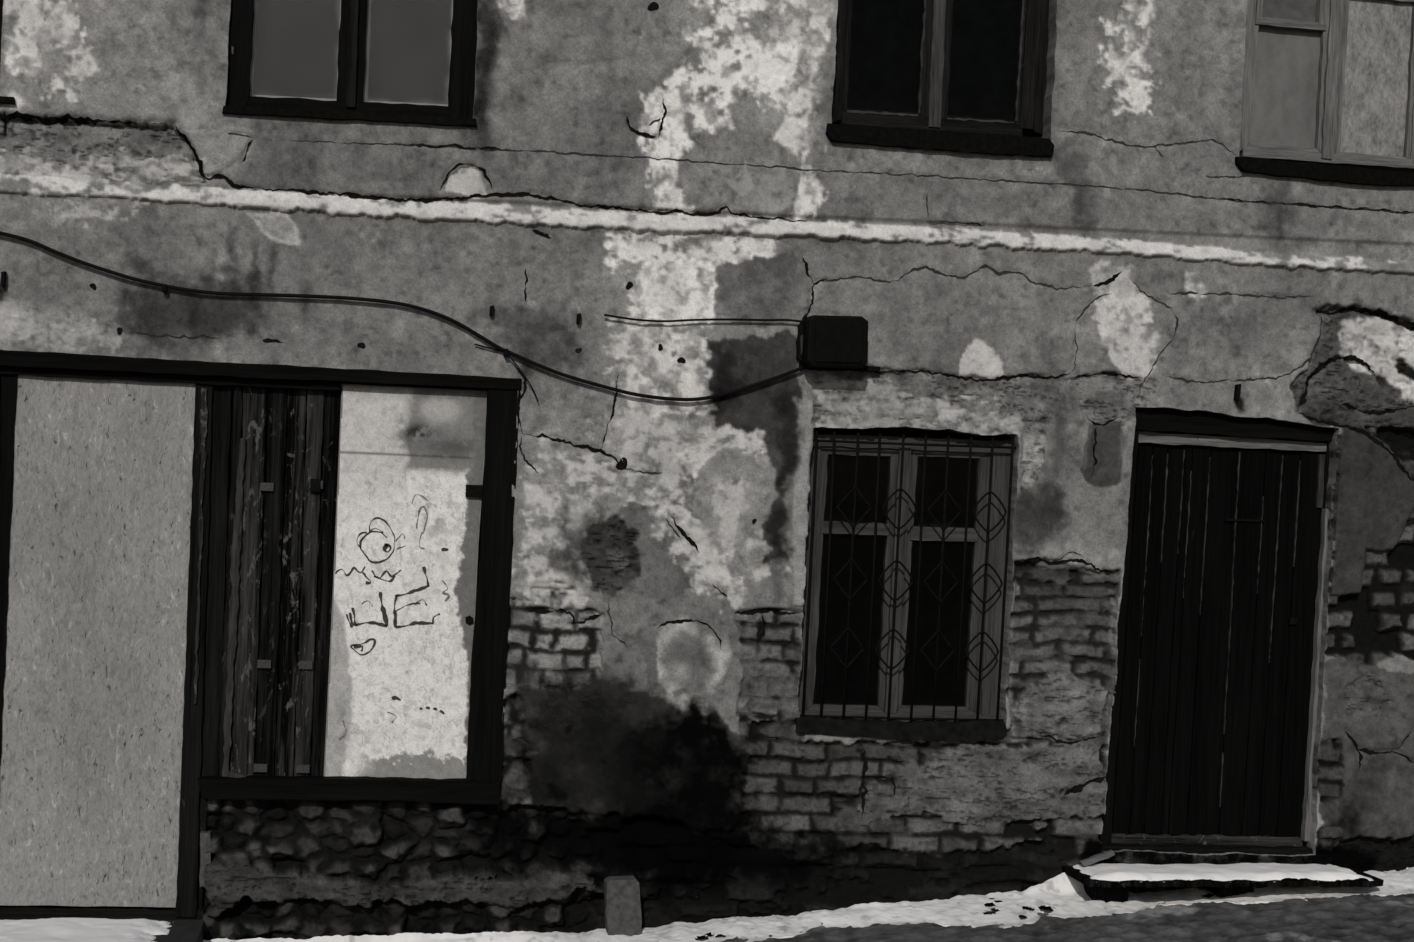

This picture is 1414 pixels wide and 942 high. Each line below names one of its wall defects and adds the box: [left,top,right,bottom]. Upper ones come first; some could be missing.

flaking render [0,0,254,224]
crack [0,99,1414,480]
peeling [1184,271,1209,302]
flaking render [203,0,1163,929]
damp [705,330,803,566]
flaking render [1290,304,1414,596]
spalling [1315,655,1414,872]